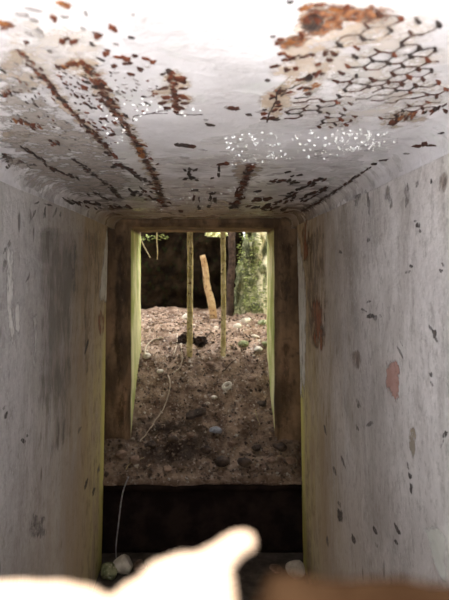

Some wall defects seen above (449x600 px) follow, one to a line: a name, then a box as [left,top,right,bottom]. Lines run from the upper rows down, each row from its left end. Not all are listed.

rust [2,49,172,208]
rust [154,68,192,114]
spalling [265,2,394,96]
rust [210,159,388,260]
spalling [386,347,403,399]